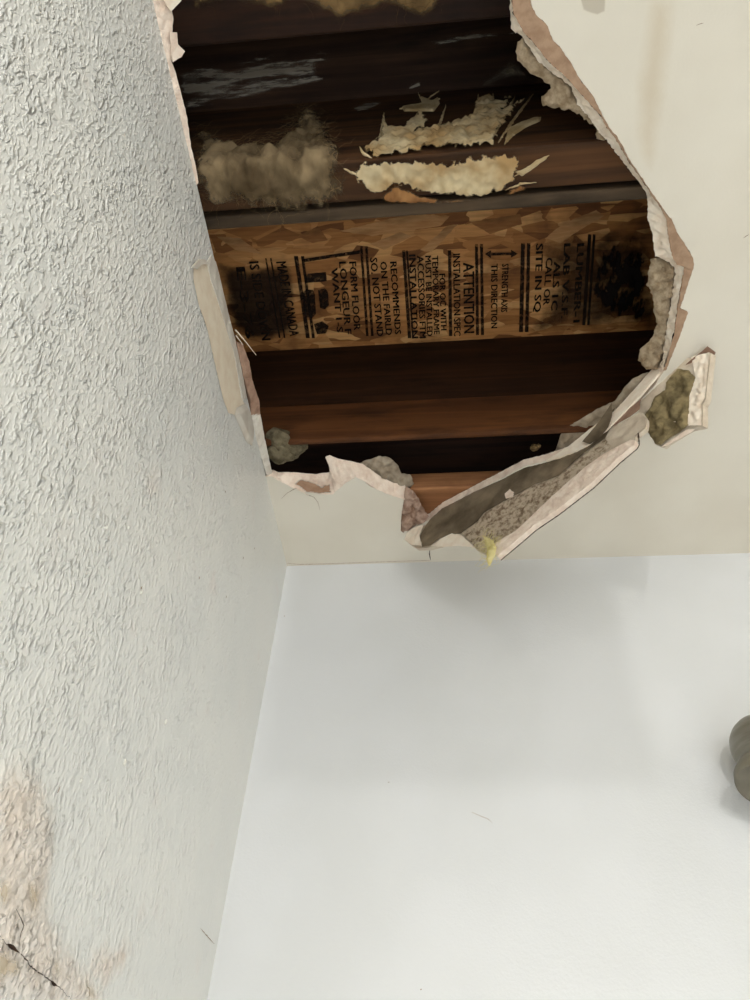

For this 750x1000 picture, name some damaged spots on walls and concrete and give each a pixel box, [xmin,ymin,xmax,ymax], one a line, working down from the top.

peeling [164,0,181,11]
peeling [169,32,185,62]
spalling [509,0,694,371]
peeling [191,255,254,445]
spalling [270,455,429,533]
crack [0,909,71,999]